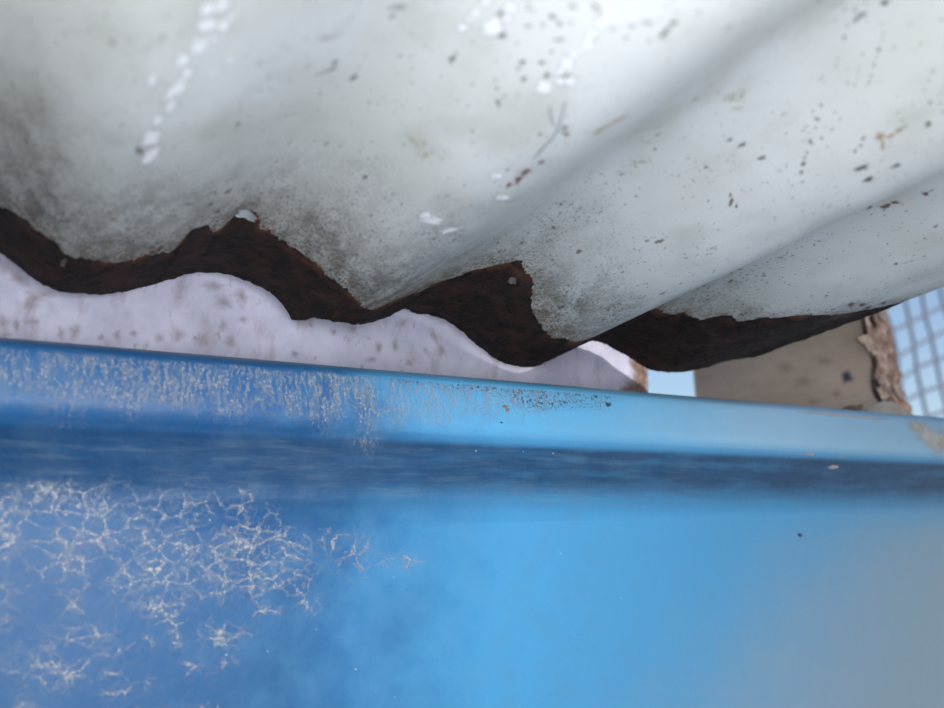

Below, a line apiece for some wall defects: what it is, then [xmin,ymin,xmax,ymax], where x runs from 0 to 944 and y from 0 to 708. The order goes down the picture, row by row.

rust [0,206,902,392]
leakage [0,349,551,440]